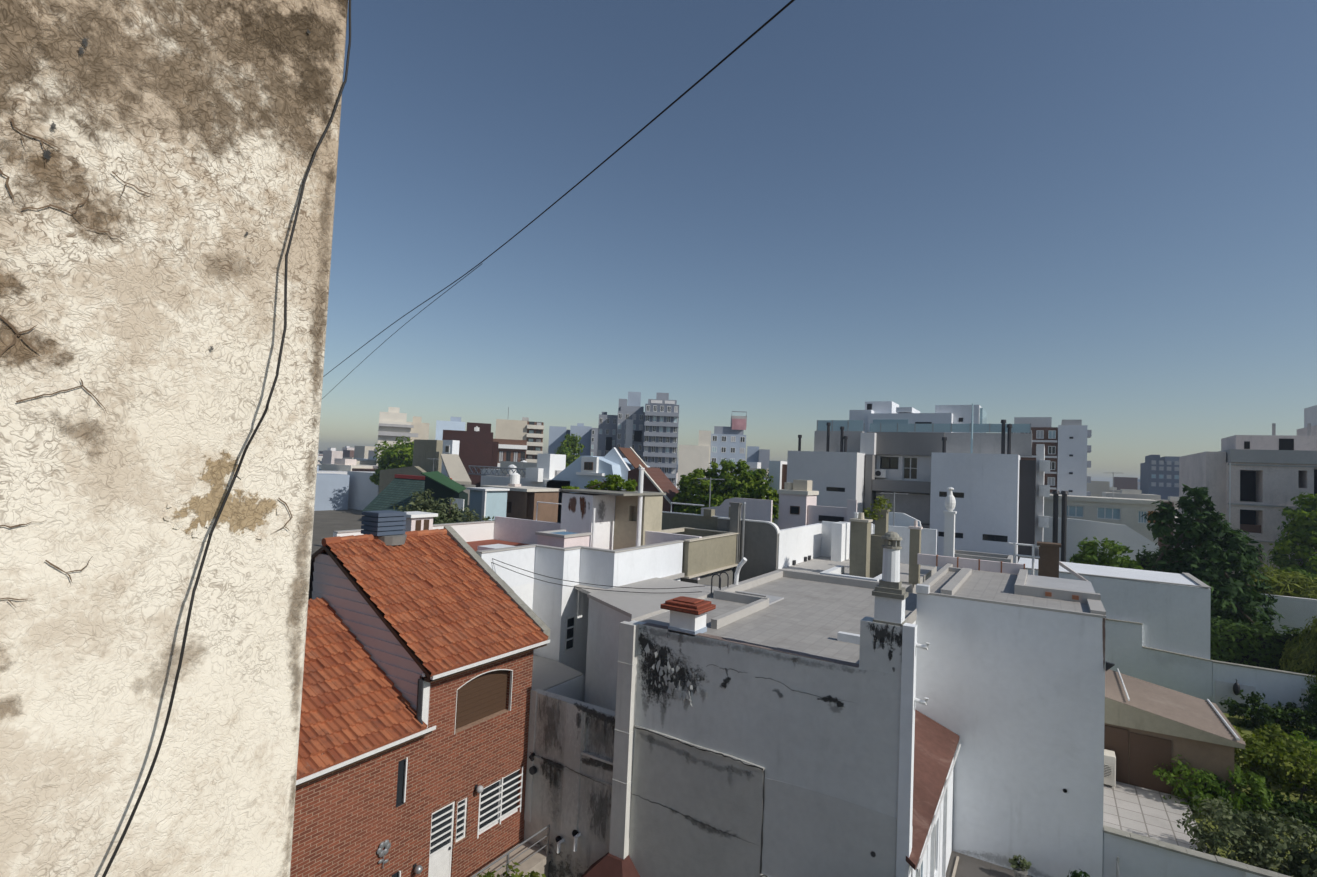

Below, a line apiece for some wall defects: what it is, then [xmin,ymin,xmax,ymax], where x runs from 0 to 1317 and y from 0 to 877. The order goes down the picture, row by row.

water stain [0,0,347,242]
water stain [312,289,326,391]
water stain [289,507,312,710]
water stain [867,623,903,672]
water stain [574,703,615,737]
water stain [541,758,563,786]
water stain [581,758,613,772]